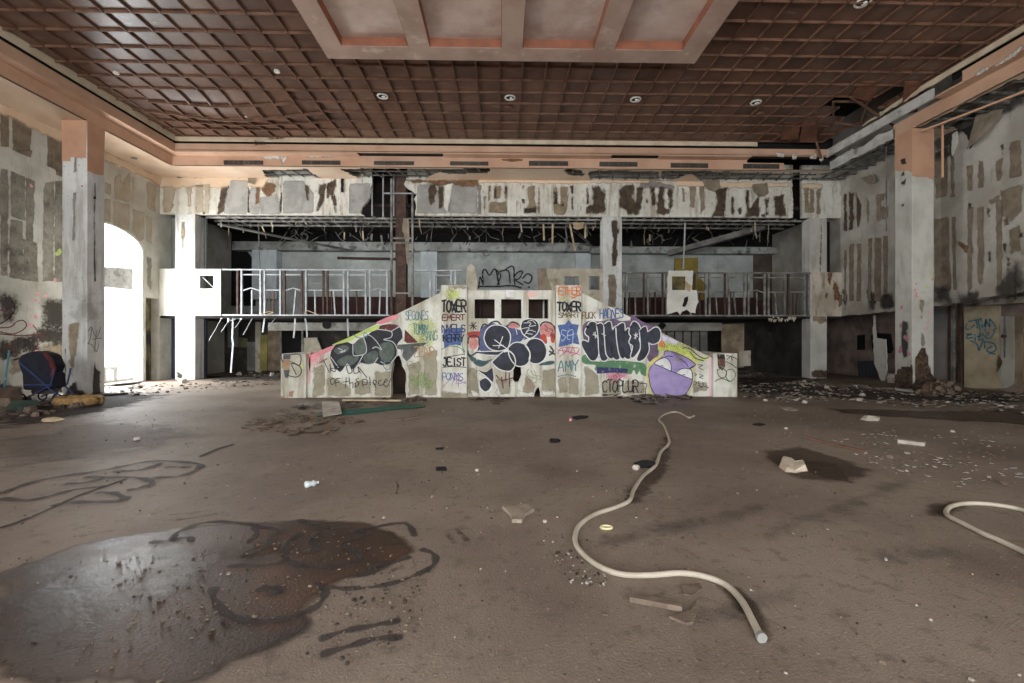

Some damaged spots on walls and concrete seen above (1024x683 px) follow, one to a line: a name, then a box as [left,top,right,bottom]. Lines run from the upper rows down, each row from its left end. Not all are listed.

peeling [0,113,32,157]
peeling [0,135,62,282]
peeling [105,173,210,243]
peeling [224,178,314,214]
peeling [341,169,370,213]
peeling [417,183,477,213]
peeling [934,109,1022,293]
peeling [844,236,888,302]
damp [0,292,21,324]
damp [0,299,79,376]
spalling [895,348,934,389]
damp [767,448,868,481]